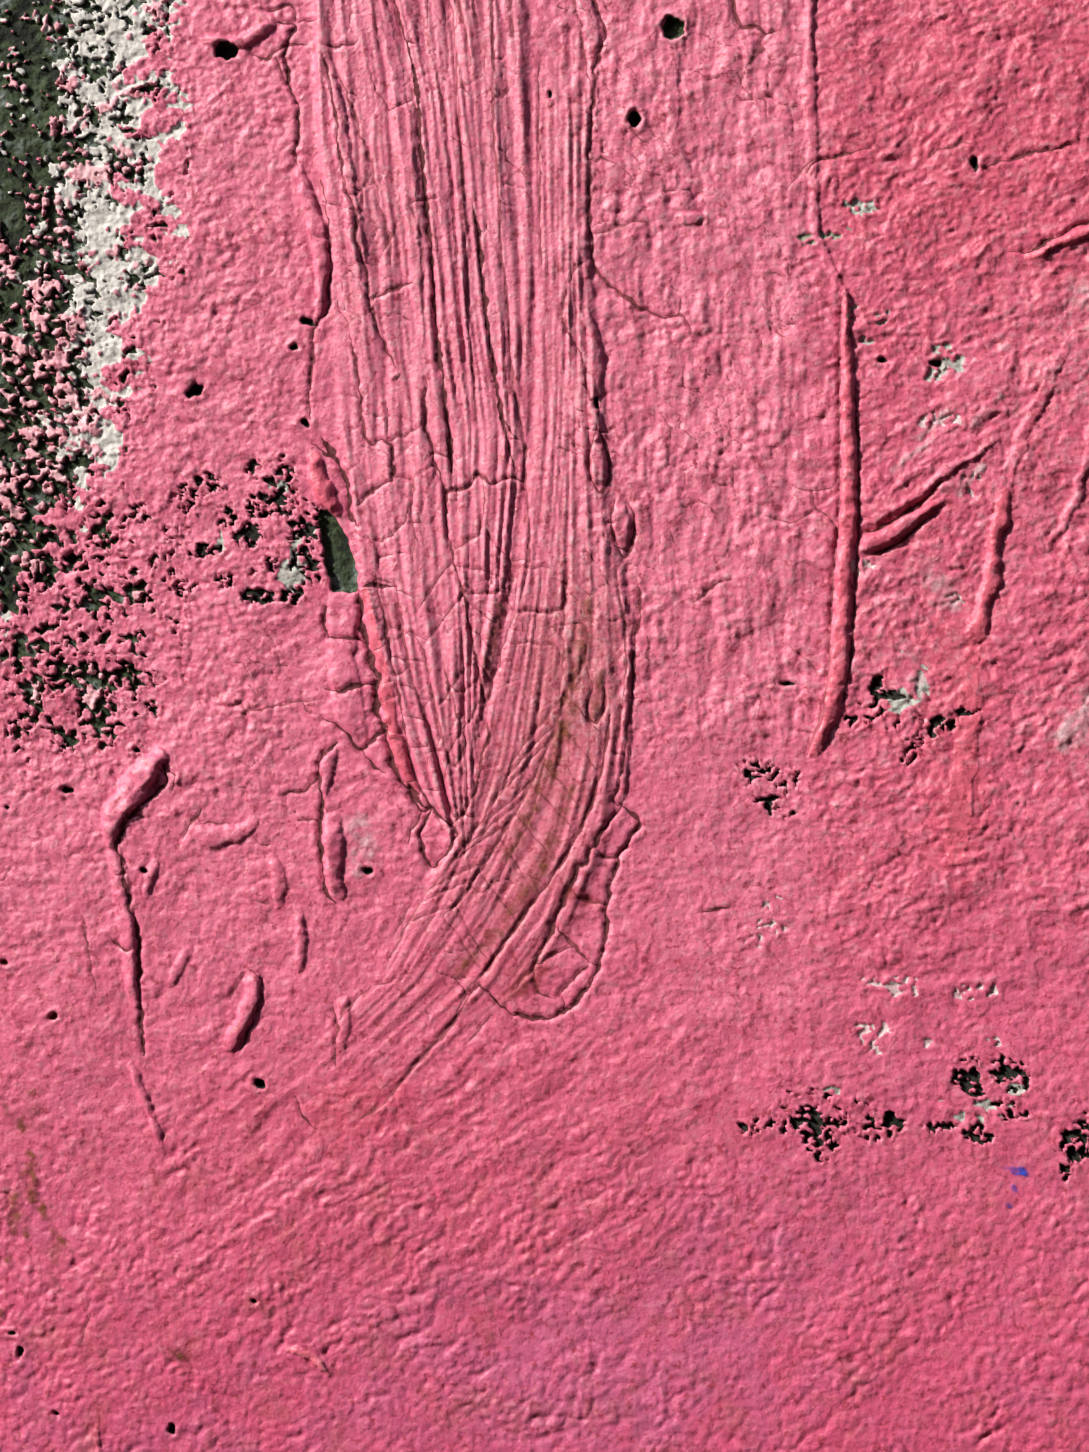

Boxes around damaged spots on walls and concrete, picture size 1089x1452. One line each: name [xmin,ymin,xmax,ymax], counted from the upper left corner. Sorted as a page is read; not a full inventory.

peeling [0,0,342,773]
crack [81,0,942,1119]
peeling [844,664,979,765]
peeling [744,760,801,816]
peeling [861,976,919,997]
peeling [954,984,999,1001]
peeling [849,1022,892,1055]
crack [295,1096,316,1129]
peeling [738,1086,905,1163]
peeling [927,1036,1030,1145]
peeling [1060,1110,1089,1182]